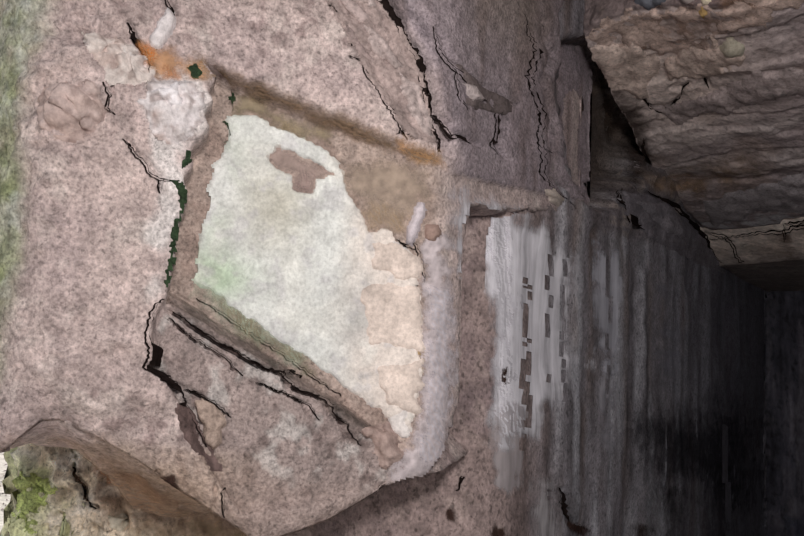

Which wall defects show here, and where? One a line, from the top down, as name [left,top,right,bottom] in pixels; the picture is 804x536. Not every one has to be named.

corrosion [145,48,304,111]
corrosion [312,115,438,162]
crack [349,44,408,139]
crack [365,0,502,153]
crack [524,15,576,209]
crack [643,78,709,113]
spalling [175,397,226,472]
crack [142,298,359,447]
flaking render [191,115,470,481]
peeling [485,200,577,491]
peeling [587,240,622,452]
crack [647,191,804,263]